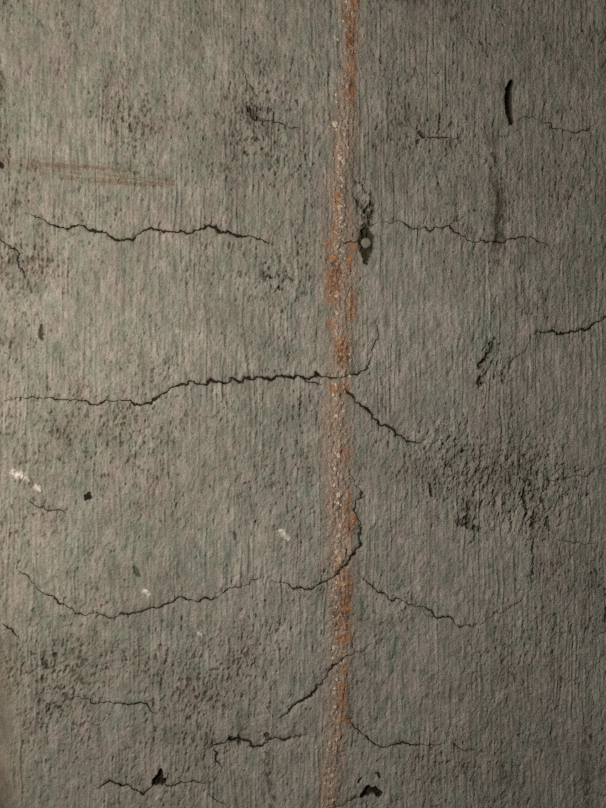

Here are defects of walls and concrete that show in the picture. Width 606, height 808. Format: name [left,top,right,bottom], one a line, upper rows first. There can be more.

spalling [505,80,513,125]
crack [32,215,267,243]
crack [342,217,550,248]
crack [510,316,606,362]
crack [5,319,423,446]
rust [321,127,358,808]
crack [16,471,522,628]
crack [529,533,594,582]
crack [206,629,368,765]
crack [92,779,225,805]